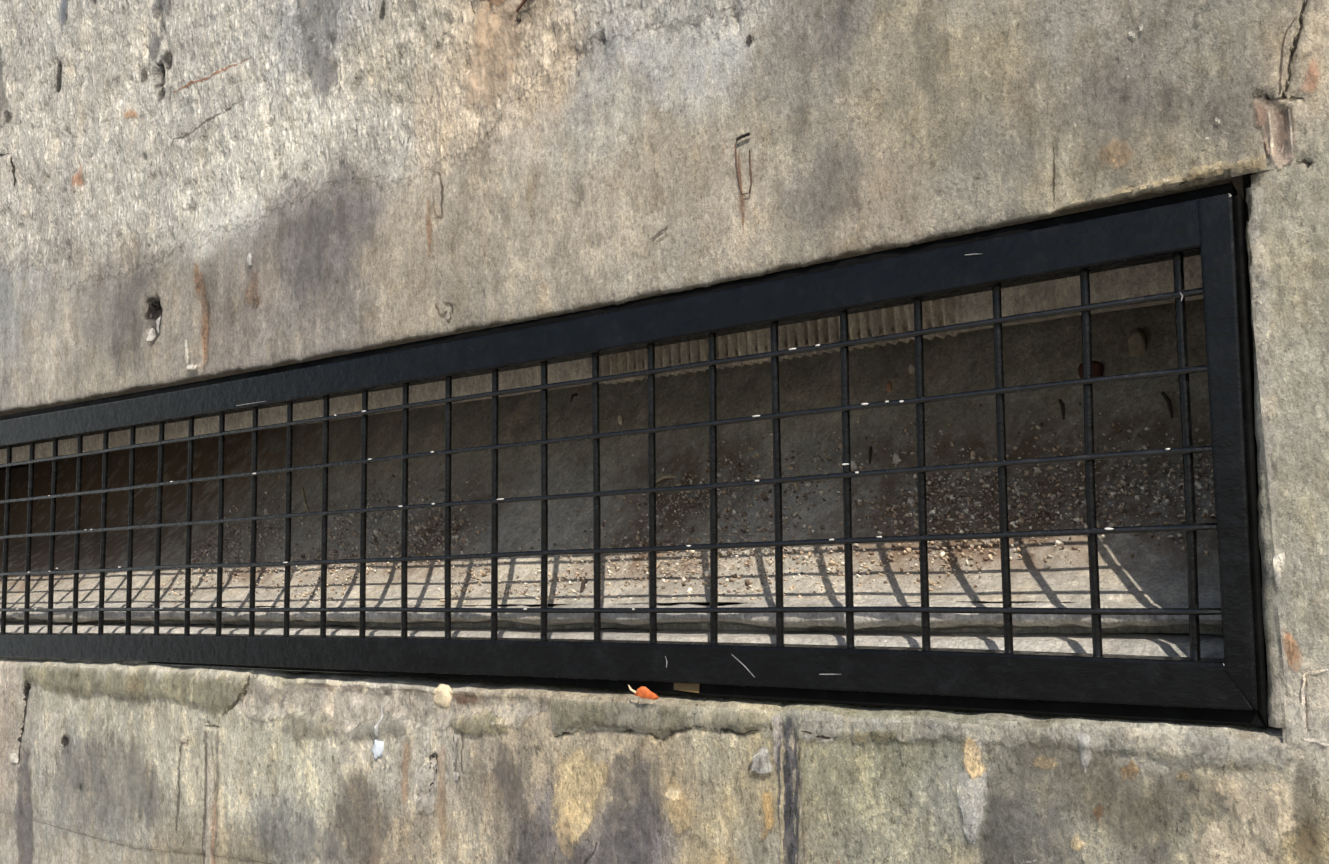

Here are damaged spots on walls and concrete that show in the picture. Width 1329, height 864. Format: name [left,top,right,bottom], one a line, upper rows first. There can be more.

crack [1253,0,1307,102]
spalling [1071,98,1310,203]
corrosion [194,264,209,356]
crack [33,820,270,864]
leakage [496,749,691,864]
leakage [762,792,774,837]